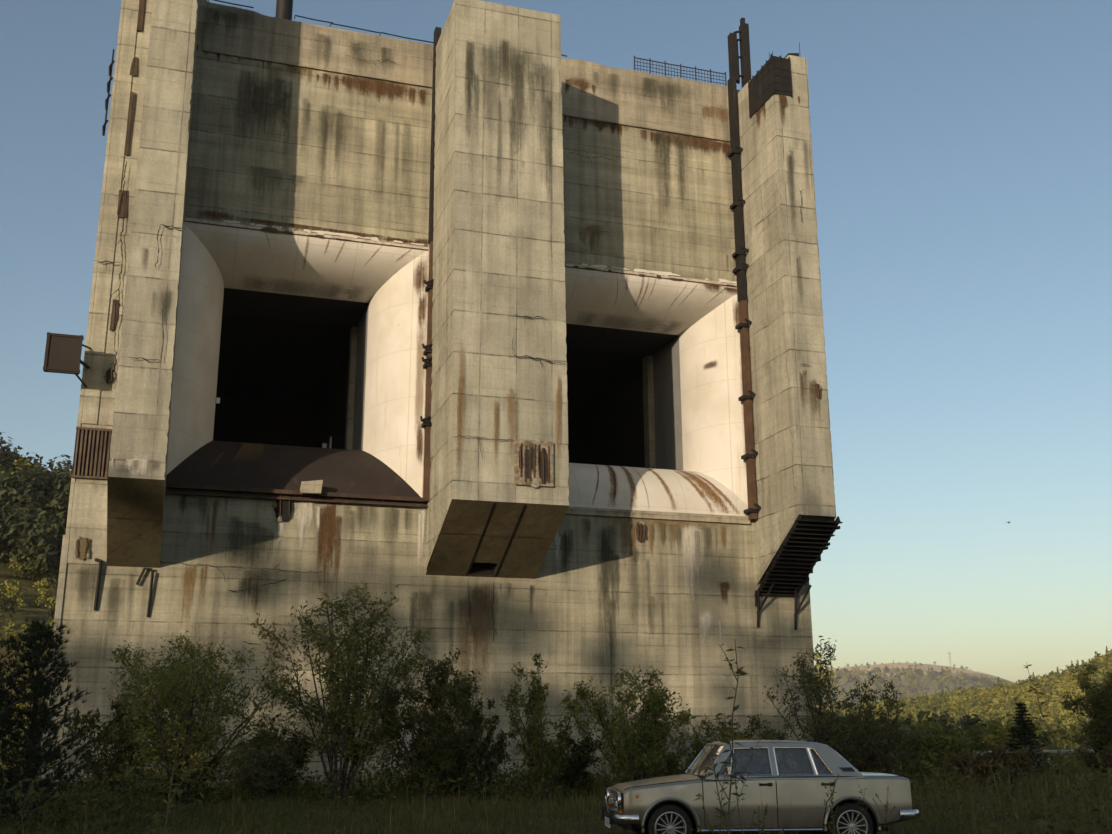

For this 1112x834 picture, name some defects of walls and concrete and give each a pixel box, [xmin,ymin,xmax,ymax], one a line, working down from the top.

rust [317,74,425,103]
rust [565,79,595,91]
rust [565,116,622,134]
rust [642,130,729,155]
crack [95,161,165,384]
rust [415,263,426,321]
rust [596,465,636,501]
rust [679,472,734,509]
rust [318,504,341,580]